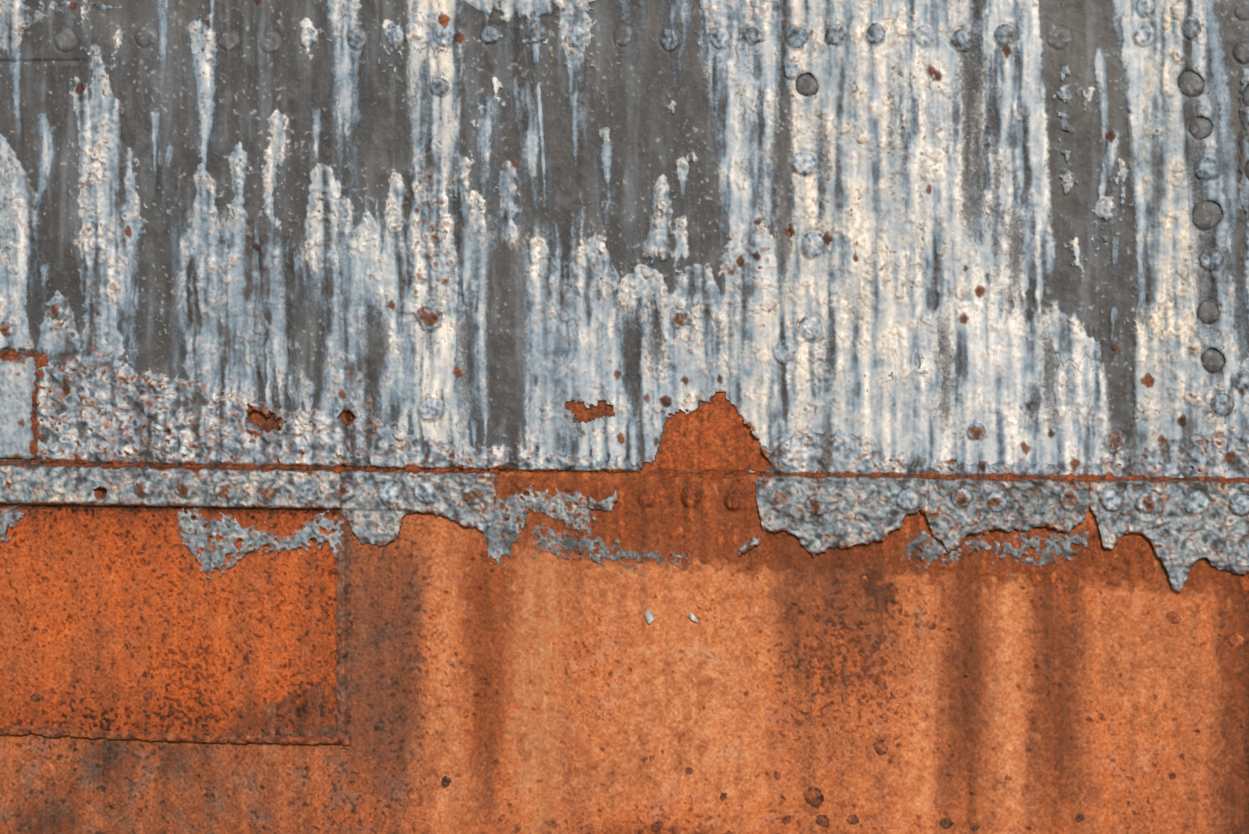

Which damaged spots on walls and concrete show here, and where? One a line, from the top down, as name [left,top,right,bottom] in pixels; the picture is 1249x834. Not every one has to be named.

peeling [0,0,1249,593]
corrosion [0,348,1249,793]
corrosion [804,786,829,827]
corrosion [940,818,953,829]